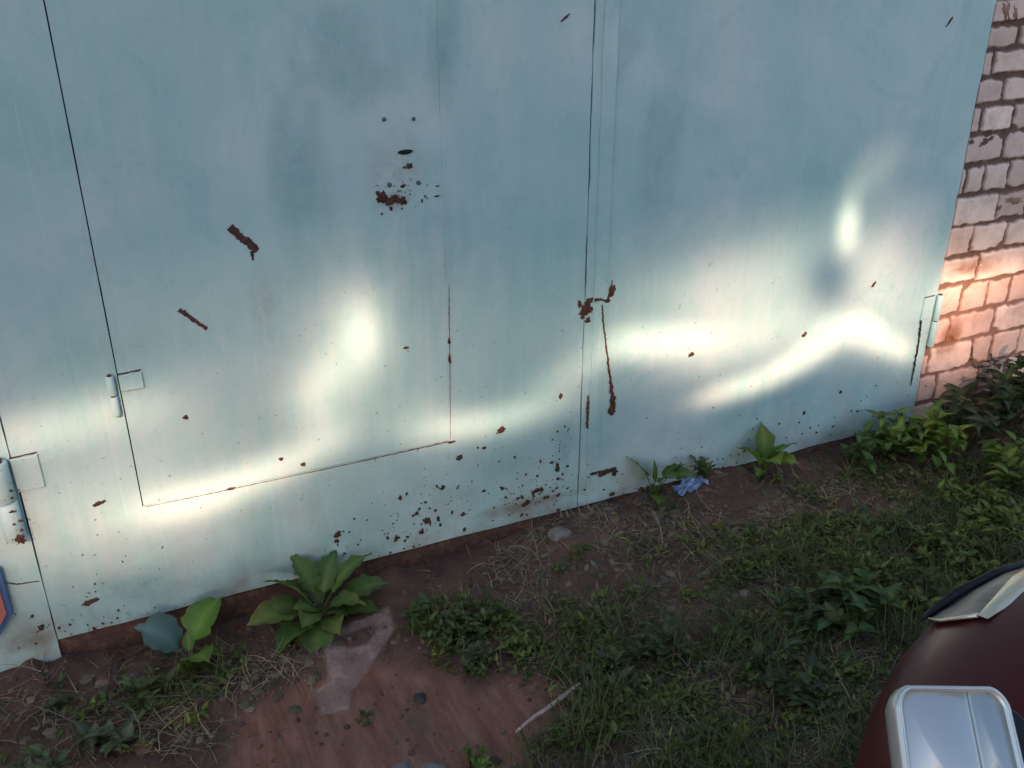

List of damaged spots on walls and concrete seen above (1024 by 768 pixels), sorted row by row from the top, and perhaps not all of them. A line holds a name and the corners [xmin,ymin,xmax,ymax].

rust [375,163,428,215]
rust [578,280,616,416]
rust [590,467,618,477]
rust [9,489,27,545]